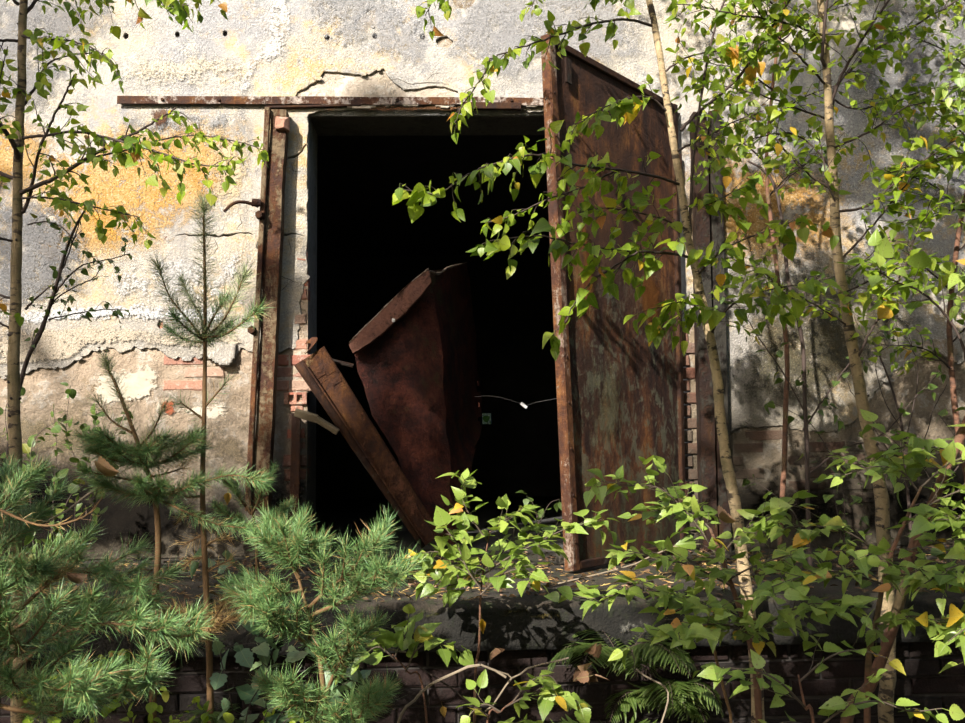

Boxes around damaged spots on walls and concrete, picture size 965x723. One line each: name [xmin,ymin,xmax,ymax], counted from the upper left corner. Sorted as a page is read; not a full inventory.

spalling [0,319,8,364]
spalling [0,376,8,466]
spalling [20,244,311,559]